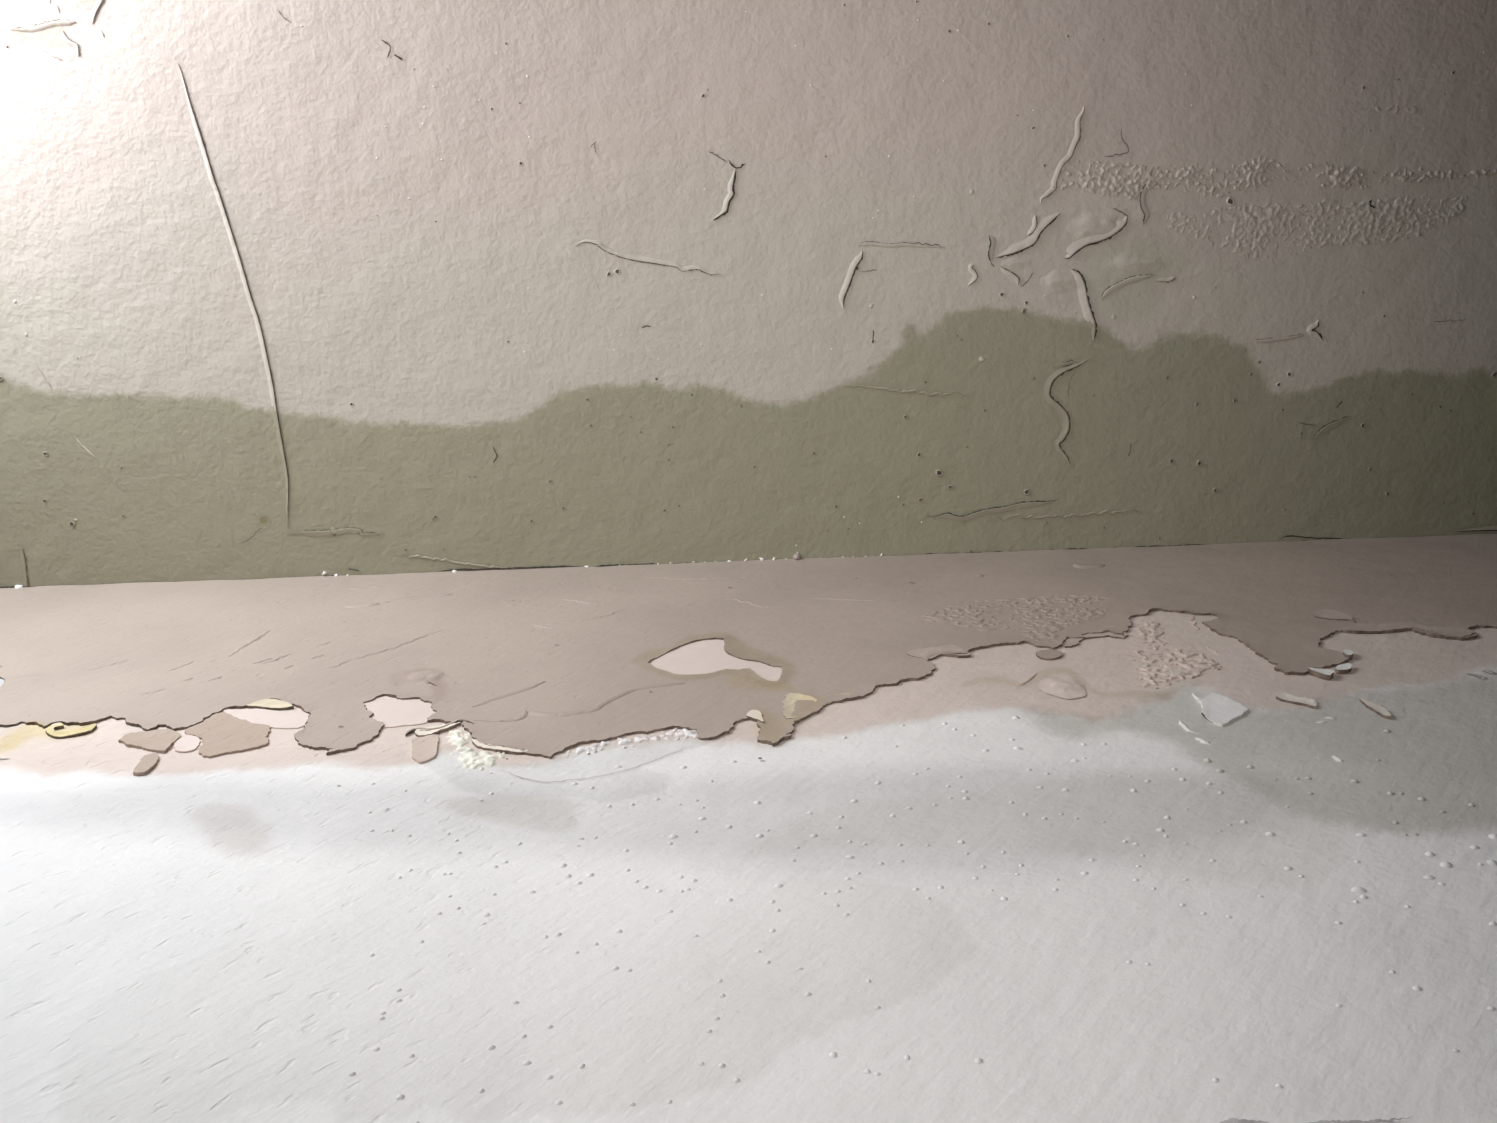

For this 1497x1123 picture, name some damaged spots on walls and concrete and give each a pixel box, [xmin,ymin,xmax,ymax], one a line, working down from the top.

crack [710,152,745,220]
crack [179,67,381,576]
crack [839,106,1176,556]
crack [438,562,698,572]
peeling [45,723,97,739]
peeling [223,699,309,729]
peeling [364,683,528,755]
leakage [0,534,1497,773]
peeling [650,639,850,719]
peeling [1192,693,1248,727]
peeling [1307,609,1475,681]
crack [1310,1115,1410,1123]